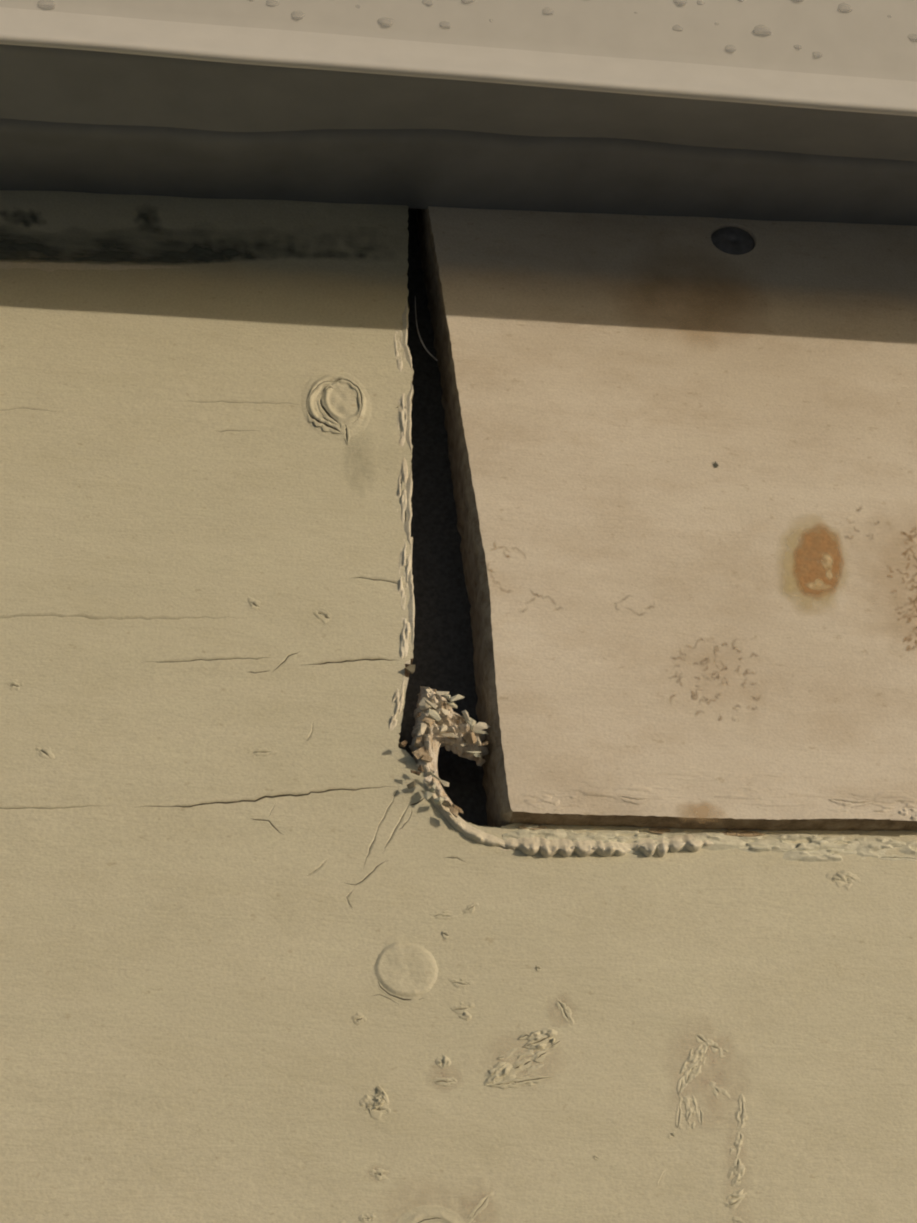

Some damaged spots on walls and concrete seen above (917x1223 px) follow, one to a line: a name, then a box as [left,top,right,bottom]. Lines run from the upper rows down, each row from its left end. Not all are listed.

leakage [0,214,267,263]
peeling [389,298,415,731]
crack [351,574,405,586]
rust [785,529,841,600]
crack [0,612,245,622]
crack [145,651,397,675]
crack [0,804,103,812]
crack [139,785,391,835]
peeling [399,689,917,890]
spalling [483,997,574,1088]
peeling [668,1034,750,1223]